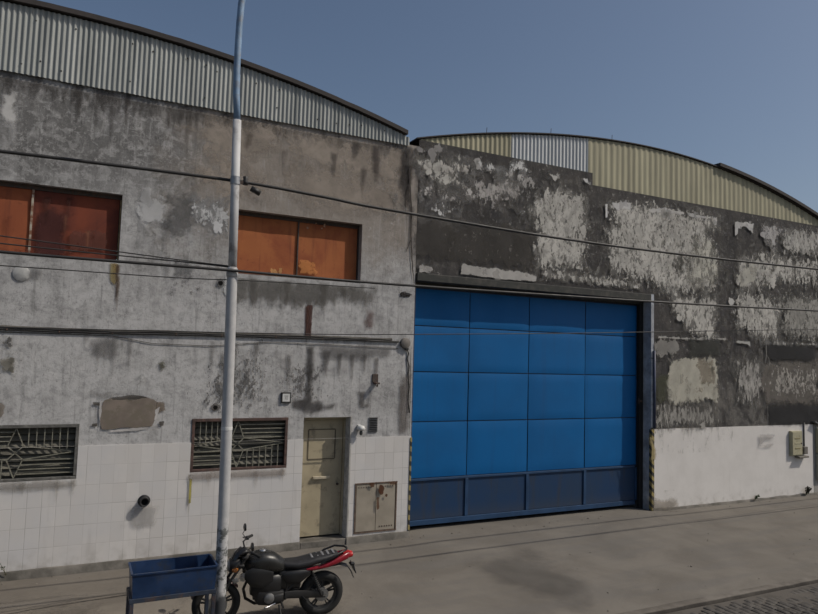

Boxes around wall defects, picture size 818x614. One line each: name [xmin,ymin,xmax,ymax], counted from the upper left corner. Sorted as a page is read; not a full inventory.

rust [110,263,119,296]
water stain [237,278,373,306]
rust [305,305,313,338]
peeling [293,136,726,433]
peeling [728,222,818,405]
water stain [200,362,224,412]
water stain [233,348,389,412]
spalling [92,395,165,432]